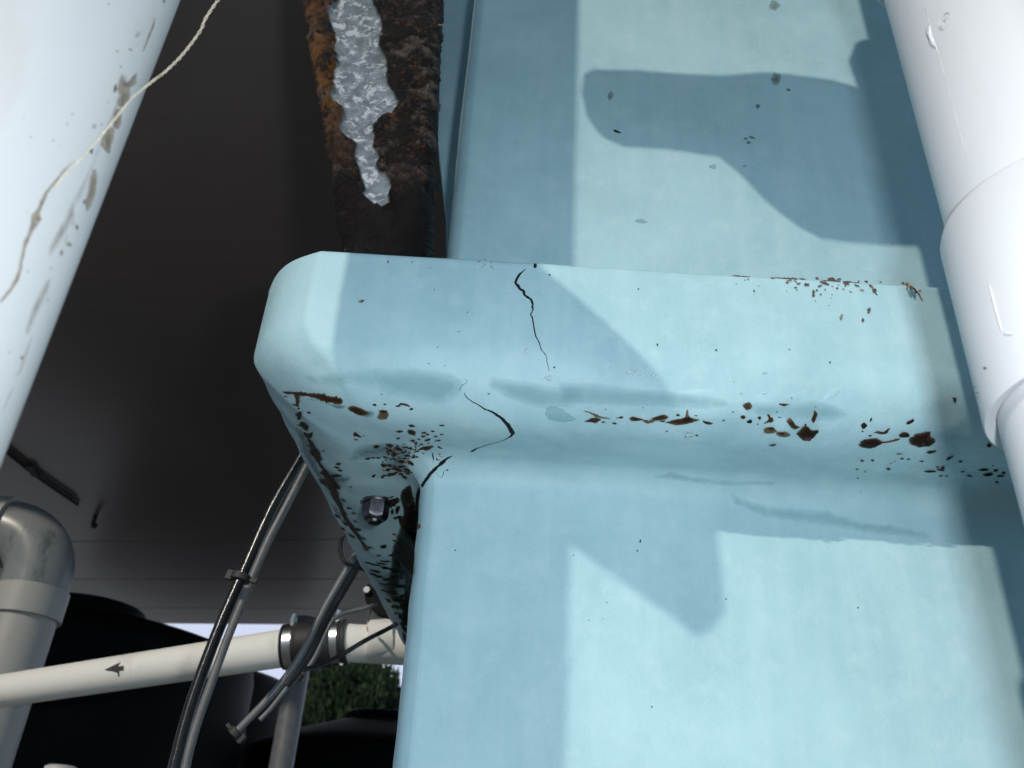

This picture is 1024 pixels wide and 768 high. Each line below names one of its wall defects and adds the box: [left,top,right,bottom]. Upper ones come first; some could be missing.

crack [514,270,549,369]
rust [771,277,882,306]
rust [282,391,413,557]
rust [365,424,445,479]
crack [415,379,515,514]
rust [584,398,818,446]
rust [856,418,1006,483]